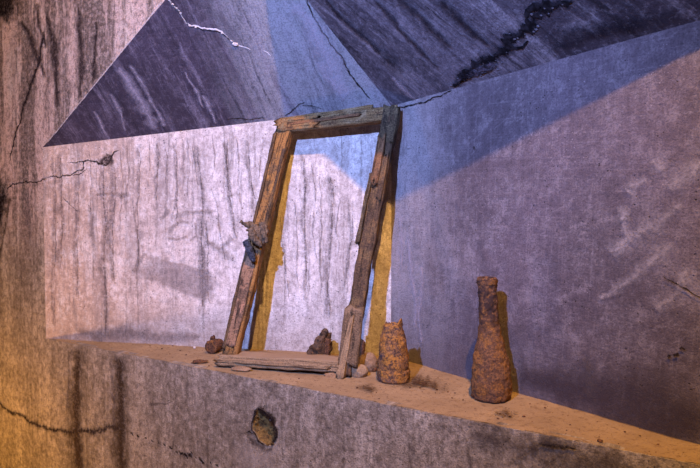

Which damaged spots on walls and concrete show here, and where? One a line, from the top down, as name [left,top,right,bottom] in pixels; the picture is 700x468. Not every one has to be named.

crack [10,37,44,160]
crack [169,0,270,55]
crack [307,0,369,98]
crack [401,0,572,108]
crack [7,150,119,189]
damp [71,352,82,468]
crack [1,404,218,466]
damp [115,360,128,468]
spalling [247,405,278,451]